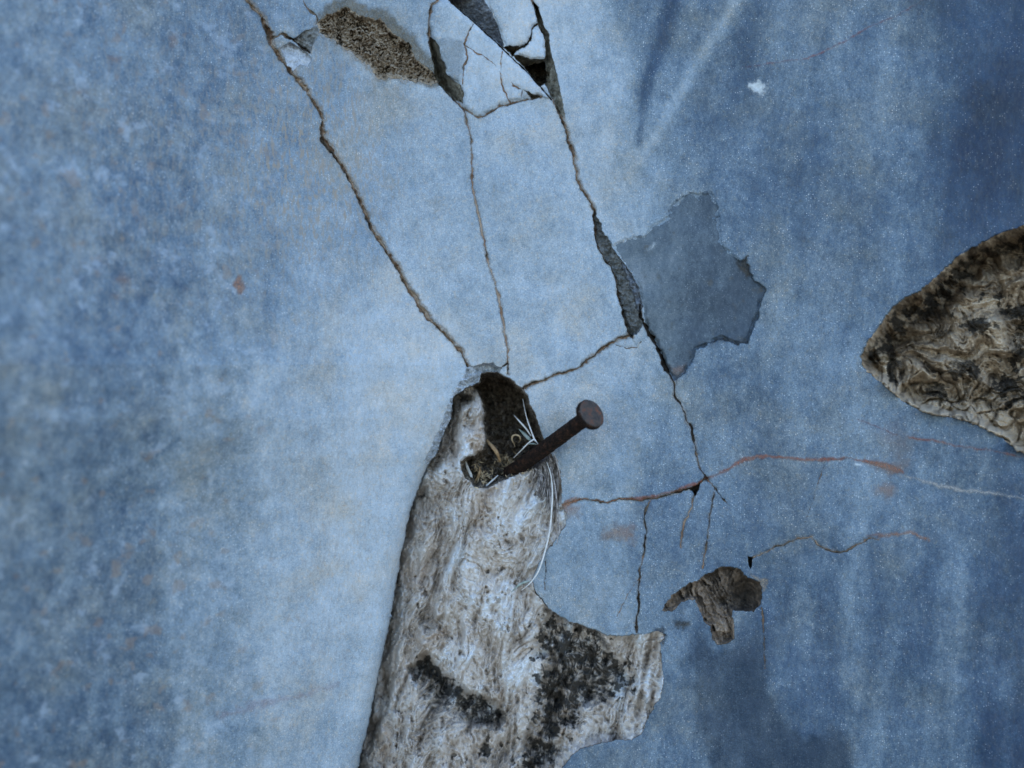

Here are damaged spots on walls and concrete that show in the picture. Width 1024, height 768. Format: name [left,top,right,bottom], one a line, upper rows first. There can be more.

spalling [281,0,439,87]
crack [245,0,470,367]
crack [427,0,727,633]
spalling [594,191,766,380]
spalling [425,363,501,464]
crack [748,473,878,568]
spalling [662,567,762,645]